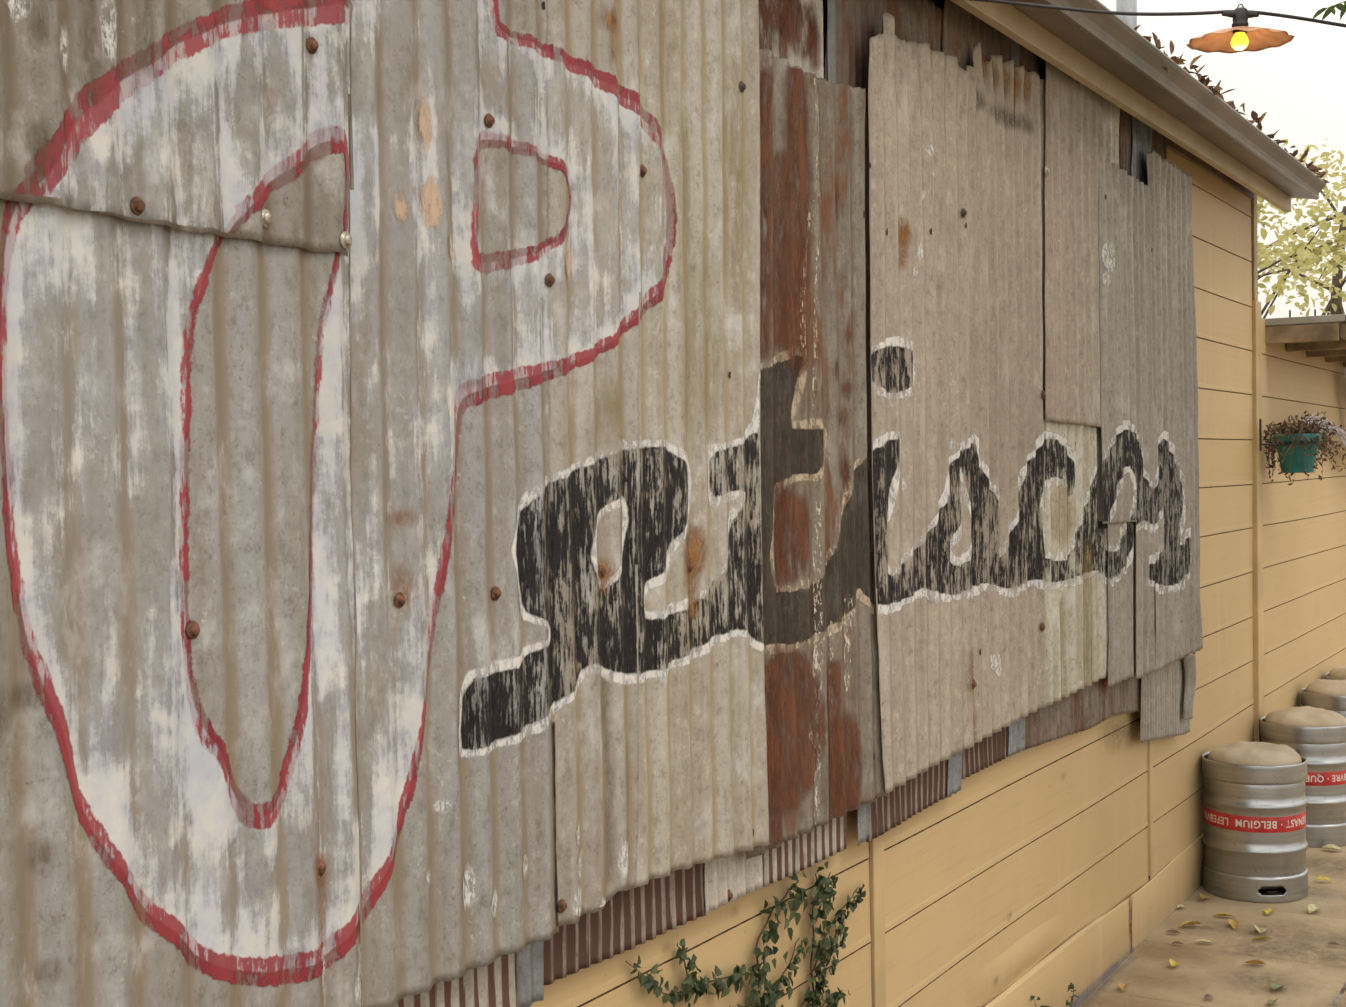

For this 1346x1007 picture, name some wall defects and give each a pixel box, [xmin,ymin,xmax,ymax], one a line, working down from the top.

rust [759,0,817,371]
rust [899,221,910,265]
rust [841,462,850,483]
rust [687,530,705,615]
rust [764,649,862,845]